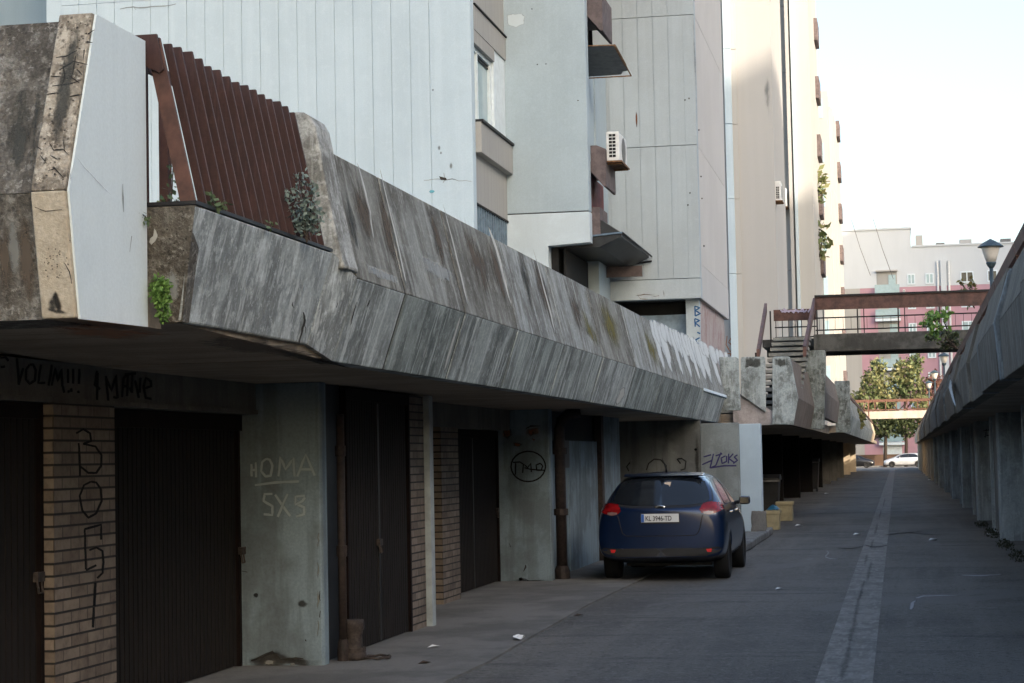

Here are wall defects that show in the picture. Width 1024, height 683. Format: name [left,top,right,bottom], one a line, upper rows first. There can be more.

crack [47,30,94,97]
water stain [11,90,39,167]
crack [38,140,67,177]
water stain [0,223,34,299]